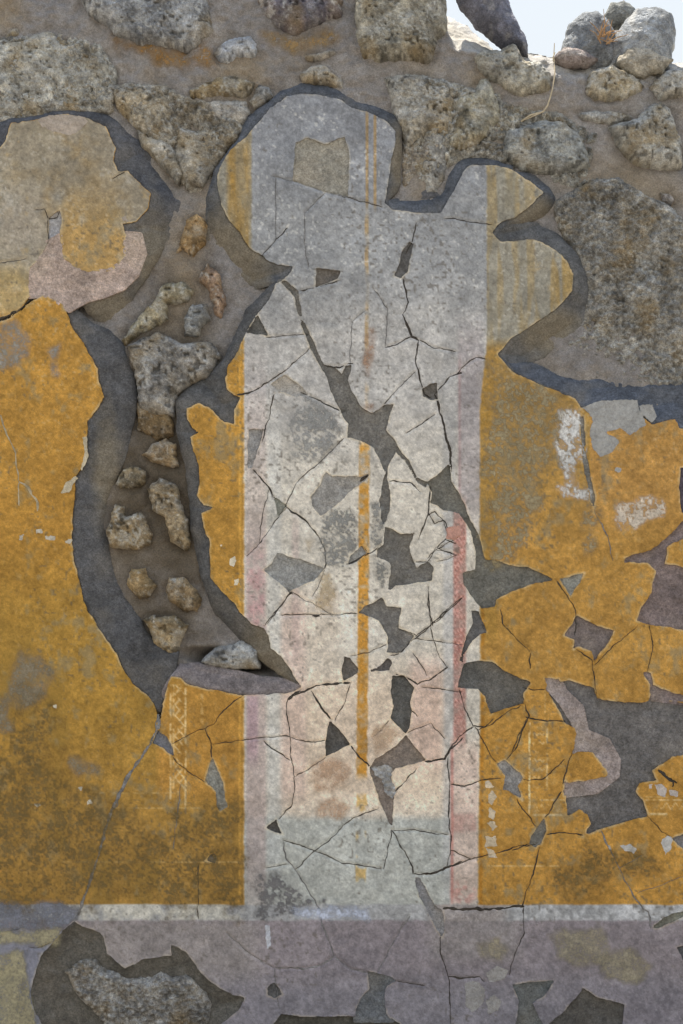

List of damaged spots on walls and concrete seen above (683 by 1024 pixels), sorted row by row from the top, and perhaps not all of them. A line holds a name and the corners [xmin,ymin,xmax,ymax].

spalling [28,211,147,313]
crack [262,176,381,291]
spalling [402,74,683,386]
crack [237,279,485,472]
crack [247,438,382,624]
crack [360,475,458,562]
spalling [277,279,583,825]
spalling [624,468,683,630]
crack [75,581,680,1024]
spalling [545,672,683,834]
spalling [31,921,244,1024]
spalling [464,966,624,1024]